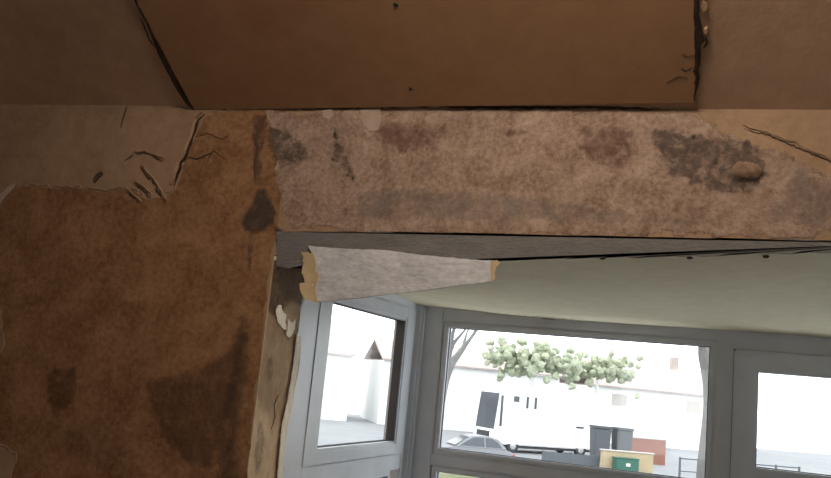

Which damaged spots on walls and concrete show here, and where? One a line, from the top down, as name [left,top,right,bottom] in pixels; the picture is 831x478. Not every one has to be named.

crack [134,0,359,186]
crack [422,104,662,112]
crack [667,0,708,101]
water stain [652,130,766,190]
water stain [243,190,281,232]
flaking render [0,107,831,478]